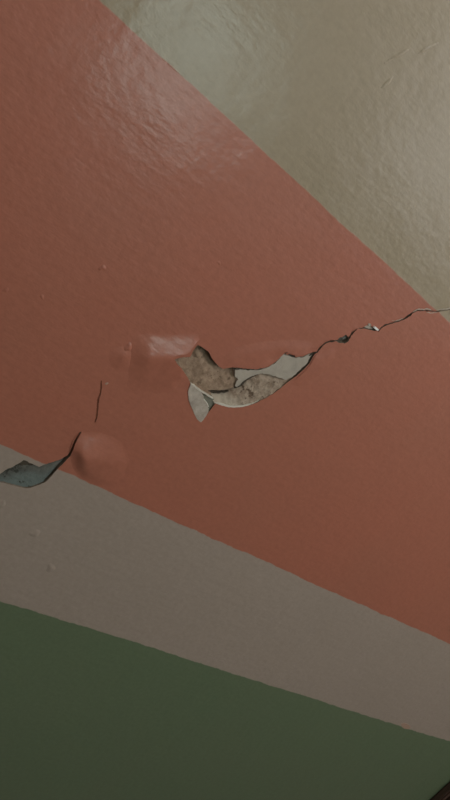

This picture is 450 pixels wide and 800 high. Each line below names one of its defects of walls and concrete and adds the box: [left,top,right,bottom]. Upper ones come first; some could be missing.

crack [311,308,450,351]
crack [69,381,102,452]
spalling [175,345,313,422]
spalling [0,456,66,487]